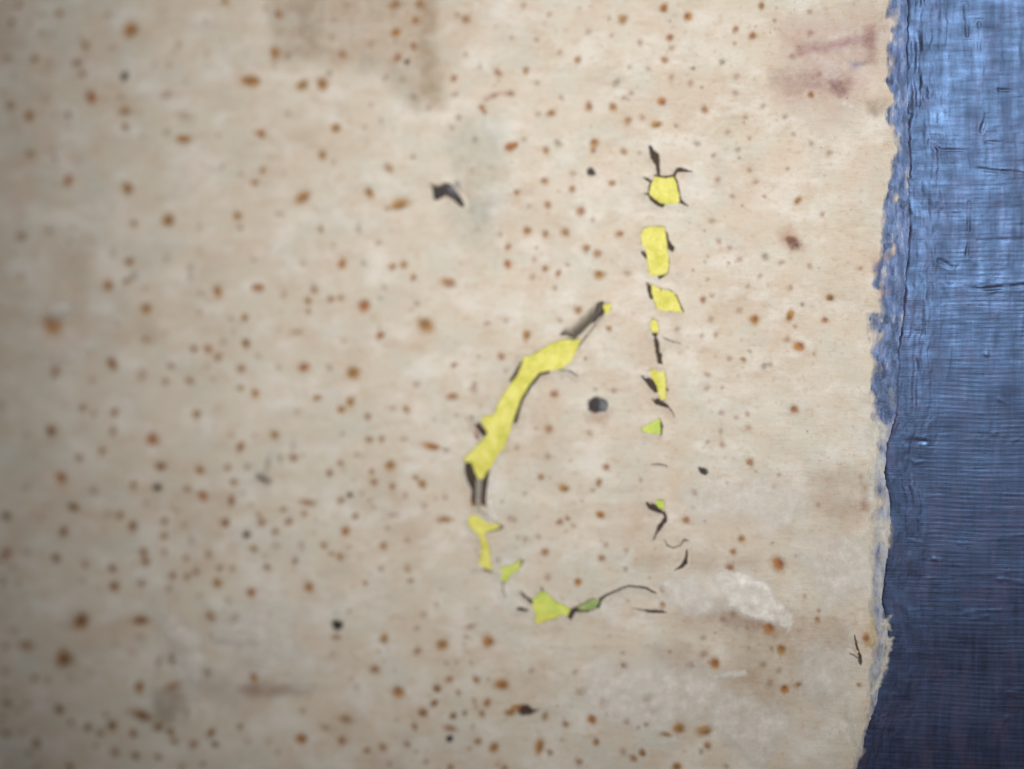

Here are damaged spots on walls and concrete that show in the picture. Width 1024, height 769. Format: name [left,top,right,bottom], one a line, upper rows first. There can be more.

rust [242,77,258,86]
rust [297,79,327,89]
peeling [631,138,700,443]
peeling [456,294,664,632]
crack [644,456,675,474]
crack [659,532,695,577]
crack [627,601,674,620]
rust [74,614,87,627]
rust [412,677,460,729]